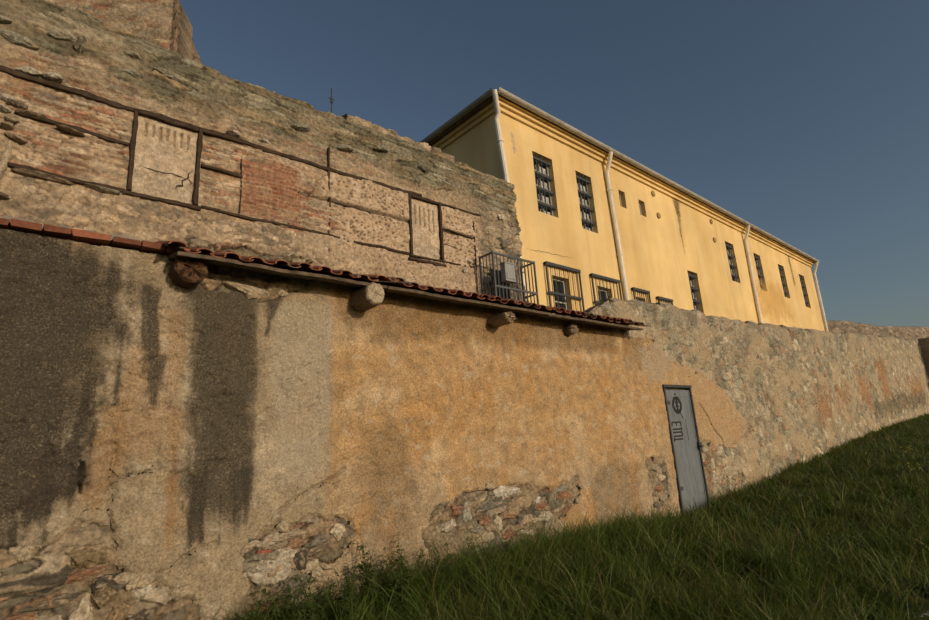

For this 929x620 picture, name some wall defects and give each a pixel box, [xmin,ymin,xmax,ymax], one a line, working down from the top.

flaking render [421,477,584,566]
flaking render [645,456,672,520]
flaking render [699,438,746,502]
flaking render [0,523,200,620]
flaking render [227,516,356,620]